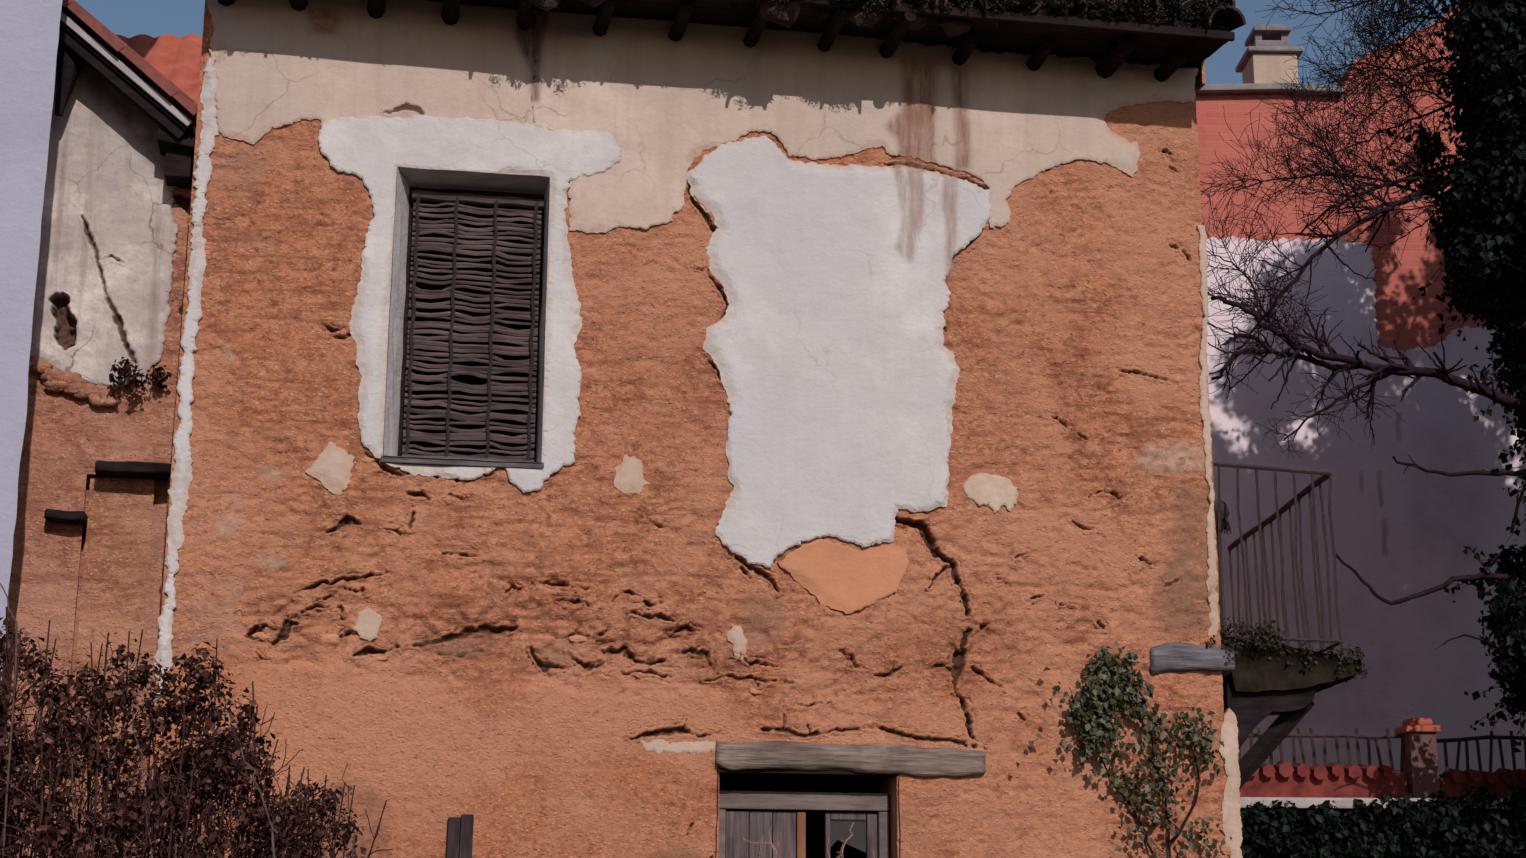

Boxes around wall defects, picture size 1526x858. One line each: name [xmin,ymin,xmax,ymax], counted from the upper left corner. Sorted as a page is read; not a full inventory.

crack [77,212,146,381]
crack [320,508,367,536]
peeling [30,0,1198,703]
crack [624,510,1010,754]
spalling [1012,708,1032,727]
peeling [1165,225,1220,636]